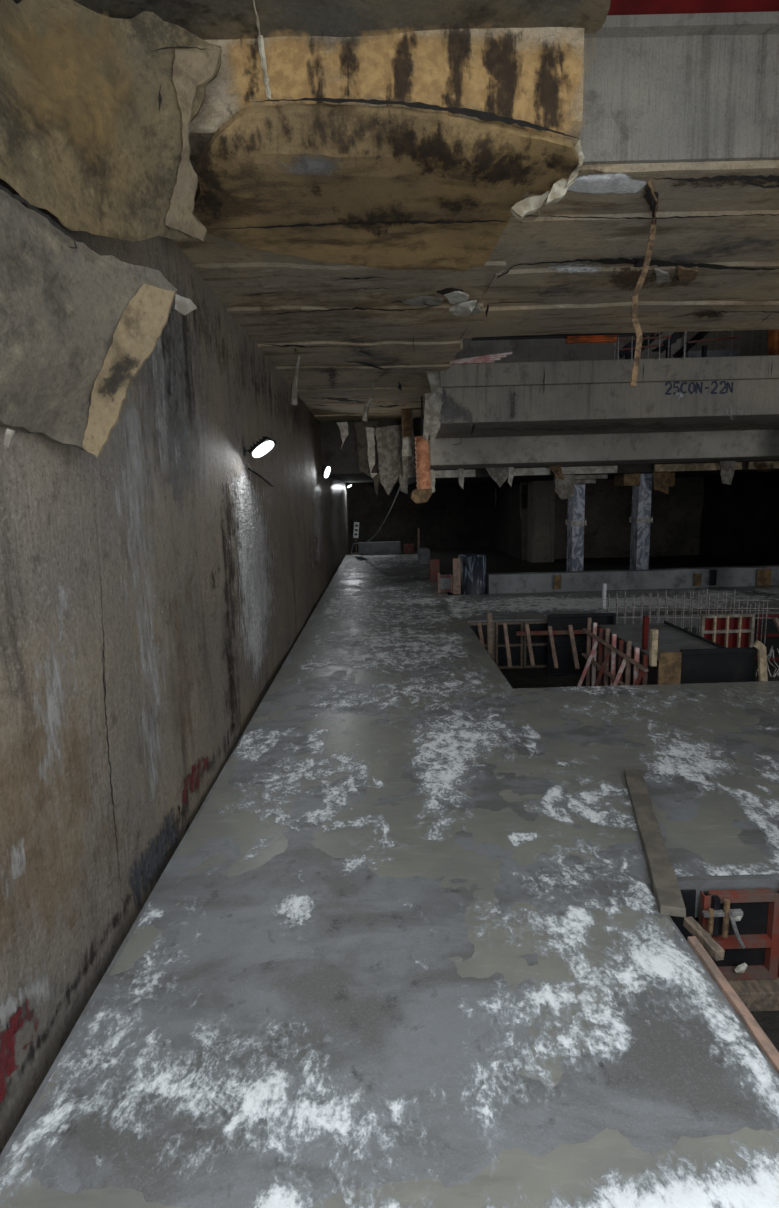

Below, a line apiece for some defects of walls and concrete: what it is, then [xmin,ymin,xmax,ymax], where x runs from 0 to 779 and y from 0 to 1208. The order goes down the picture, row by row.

water stain [190,25,583,219]
water stain [333,207,412,236]
crack [220,175,779,229]
crack [486,258,778,317]
crack [672,298,779,323]
peeling [337,371,443,504]
water stain [109,292,220,804]
water stain [0,463,282,1107]